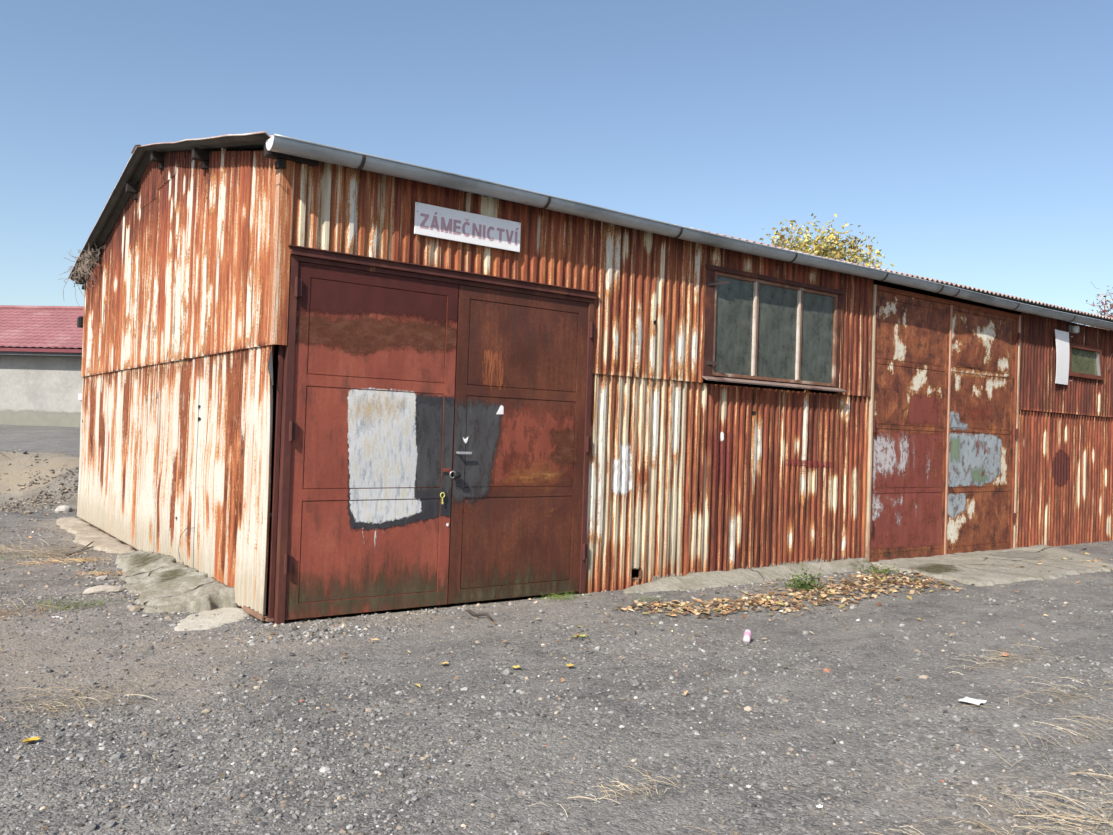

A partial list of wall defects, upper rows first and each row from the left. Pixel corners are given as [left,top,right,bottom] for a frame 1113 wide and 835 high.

rust [295,262,458,355]
peeling [878,296,1010,417]
rust [84,384,105,487]
rust [122,374,130,448]
rust [156,358,191,547]
rust [221,353,244,576]
rust [504,428,578,484]
rust [635,458,649,501]
peeling [992,444,1008,488]
rust [1052,449,1070,486]